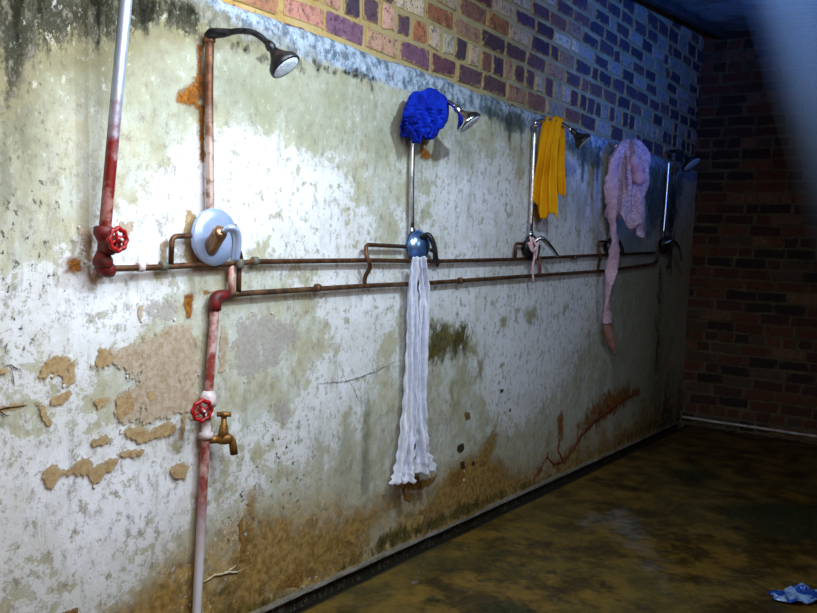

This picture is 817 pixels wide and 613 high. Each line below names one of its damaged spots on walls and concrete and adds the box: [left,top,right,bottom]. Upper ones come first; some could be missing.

leakage [13,0,23,40]
leakage [91,0,107,46]
leakage [132,0,160,34]
corrosion [177,45,205,162]
corrosion [66,257,82,273]
corrosion [184,293,194,318]
peeling [35,354,76,426]
peeling [42,294,201,490]
corrosion [554,385,639,470]
leakage [435,429,529,518]
leakage [214,499,395,613]
leakage [378,525,407,546]